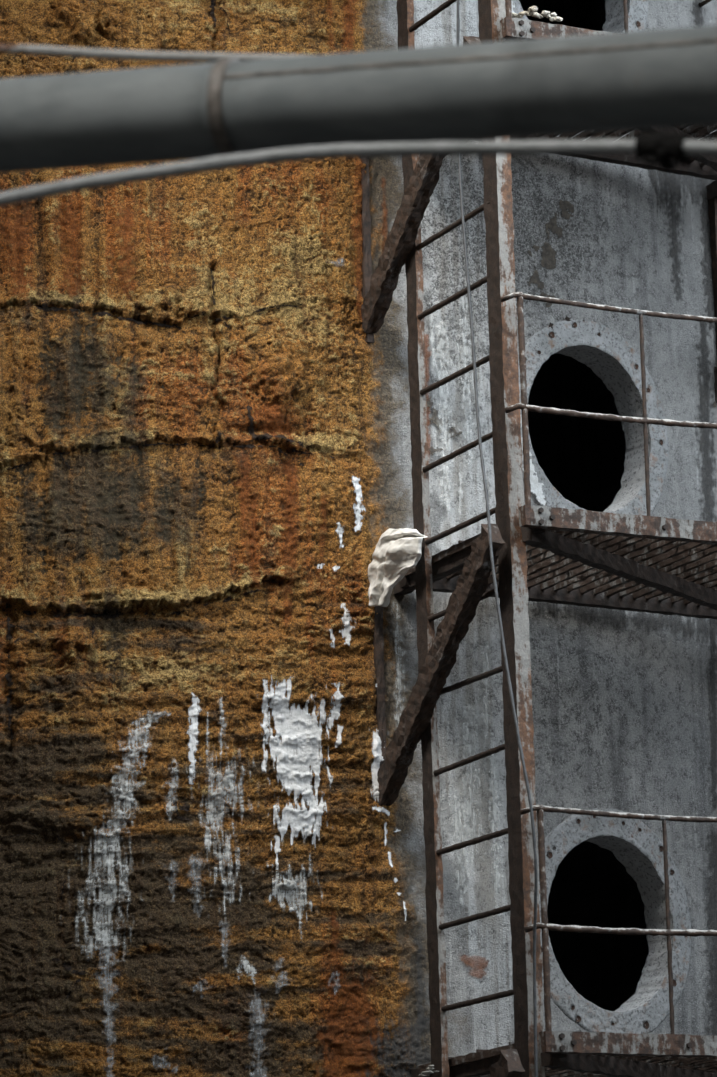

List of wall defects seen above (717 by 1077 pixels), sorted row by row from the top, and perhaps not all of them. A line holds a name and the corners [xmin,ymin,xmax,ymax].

crack [209,0,230,38]
crack [26,269,302,344]
crack [7,432,335,489]
water stain [167,693,226,814]
water stain [200,677,344,957]
water stain [75,712,171,1040]
rust [462,955,487,978]